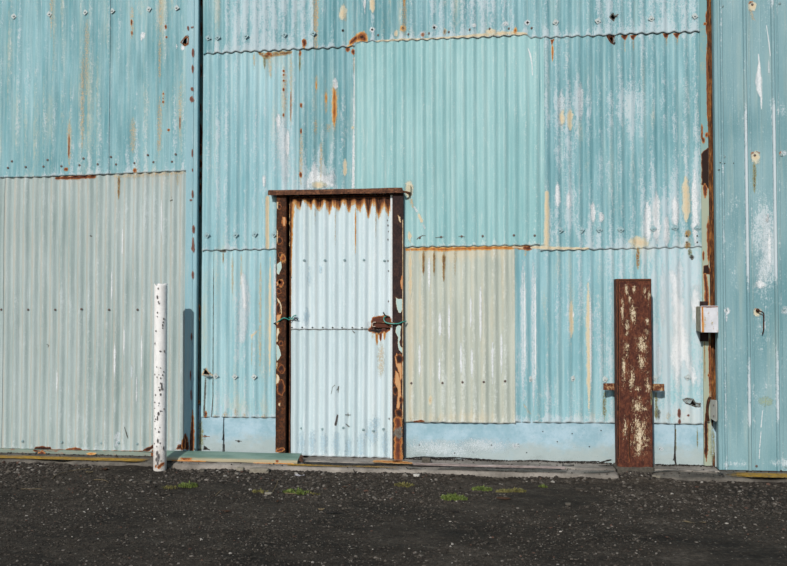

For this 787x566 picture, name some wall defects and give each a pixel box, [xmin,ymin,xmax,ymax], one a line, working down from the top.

corrosion [253,0,319,125]
corrosion [313,75,339,132]
corrosion [345,31,368,73]
corrosion [278,194,393,293]
corrosion [368,315,391,379]
corrosion [616,279,651,461]